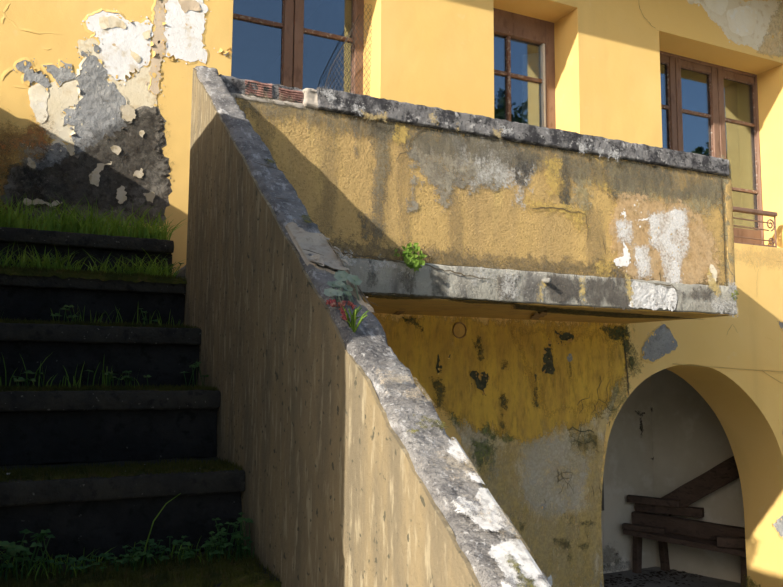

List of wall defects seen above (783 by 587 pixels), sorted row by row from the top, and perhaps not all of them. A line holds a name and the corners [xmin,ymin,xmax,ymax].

peeling [685,0,783,53]
spalling [13,0,232,171]
water stain [0,104,173,227]
crack [531,207,606,260]
peeling [613,200,690,311]
water stain [236,93,735,587]
spalling [640,322,678,364]
spalling [771,513,783,541]